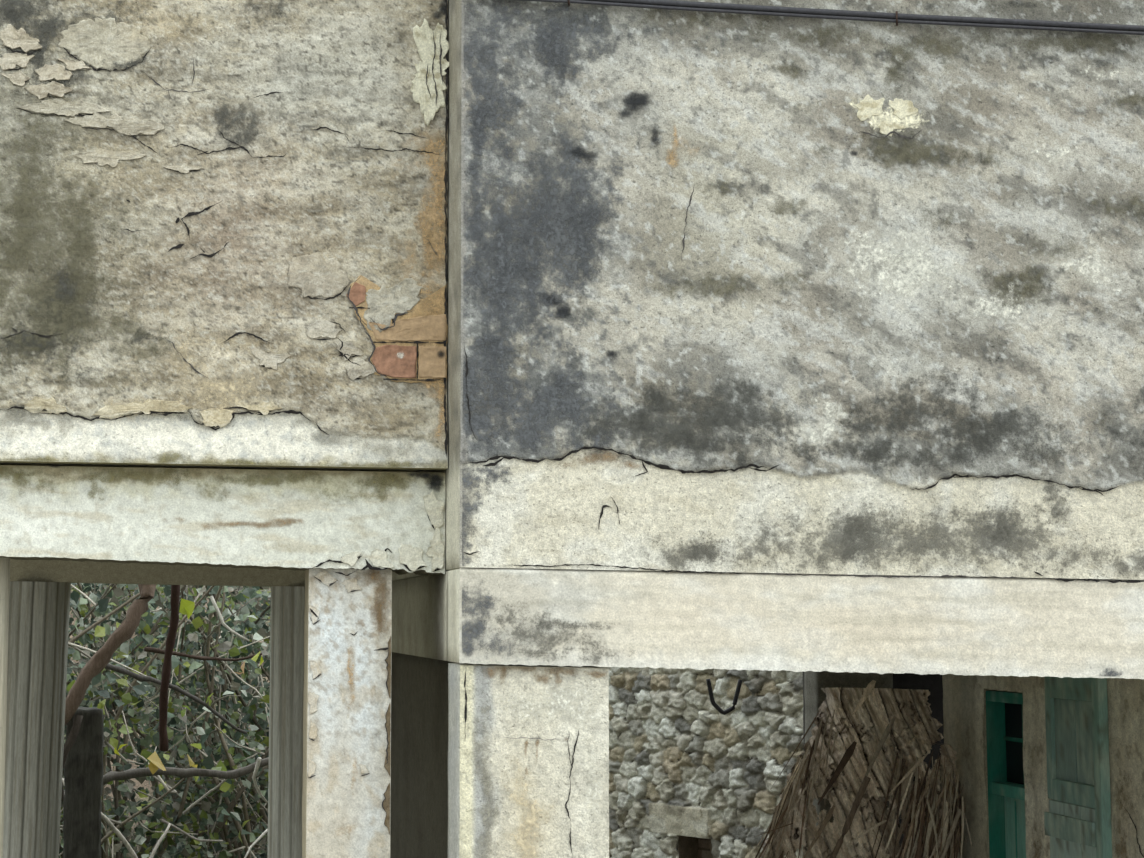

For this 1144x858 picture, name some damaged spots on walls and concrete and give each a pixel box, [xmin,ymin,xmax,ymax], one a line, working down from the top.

peeling [0,17,165,136]
peeling [411,0,449,127]
peeling [849,95,921,139]
water stain [0,122,165,377]
crack [169,202,227,259]
flaking render [288,251,448,384]
crack [313,0,779,476]
water stain [462,0,1065,566]
crack [140,407,329,435]
water stain [653,478,1144,576]
water stain [462,590,614,681]
crack [504,731,579,852]